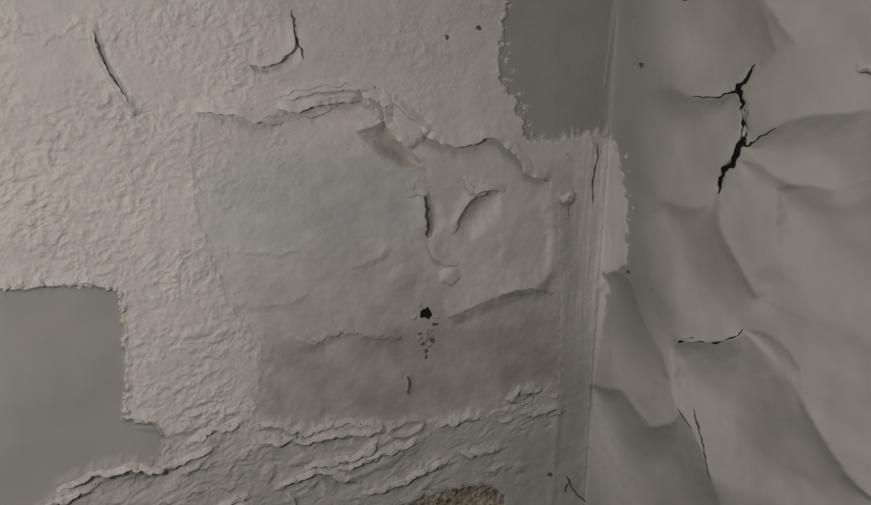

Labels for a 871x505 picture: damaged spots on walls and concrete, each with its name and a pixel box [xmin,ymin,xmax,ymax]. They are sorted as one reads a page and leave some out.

peeling [195,0,618,182]
crack [692,64,775,194]
peeling [0,277,566,505]
crack [674,329,743,344]